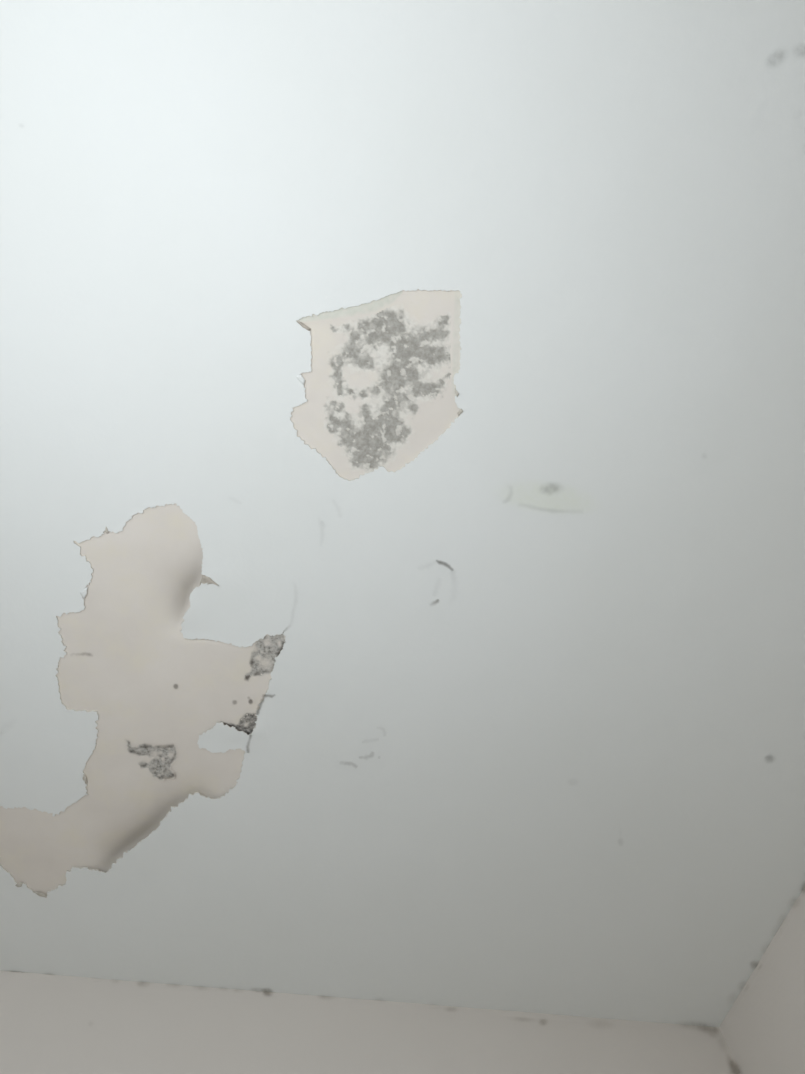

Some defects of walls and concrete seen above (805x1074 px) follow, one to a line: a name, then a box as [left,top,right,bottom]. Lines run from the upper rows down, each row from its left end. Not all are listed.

peeling [290,289,463,480]
peeling [0,503,286,898]